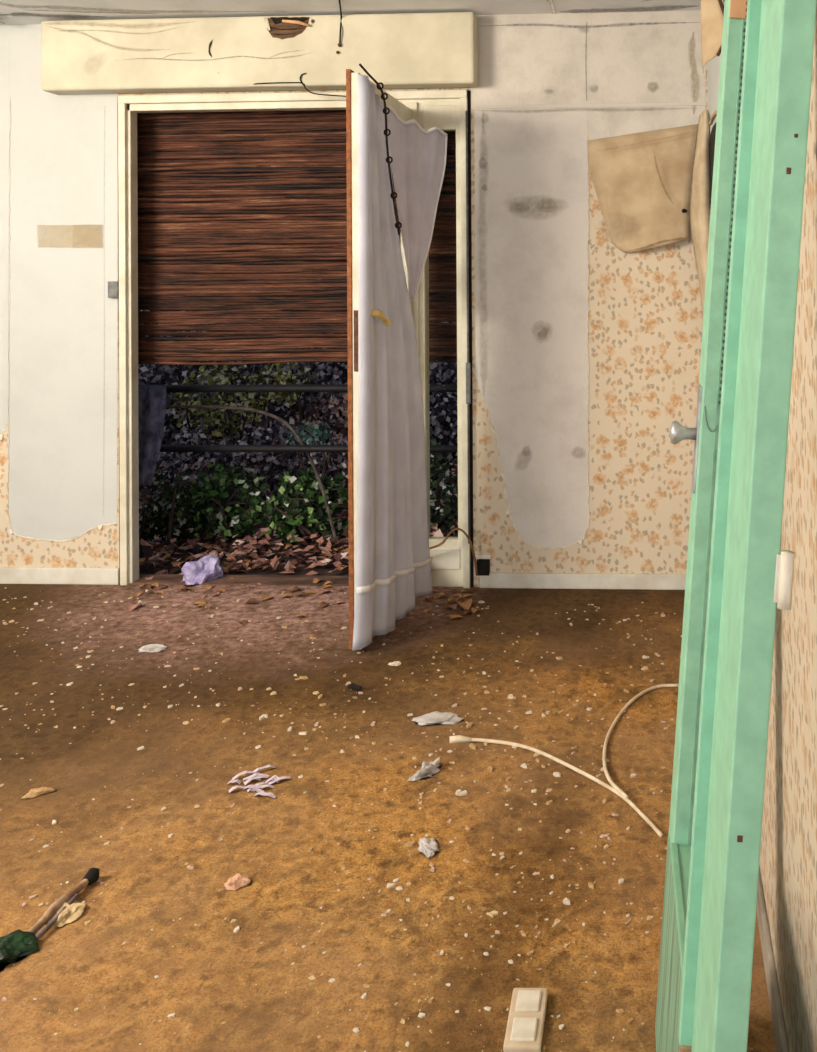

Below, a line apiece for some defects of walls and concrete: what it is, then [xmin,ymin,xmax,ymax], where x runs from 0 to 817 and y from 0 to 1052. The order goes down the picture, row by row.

spalling [263,17,310,40]